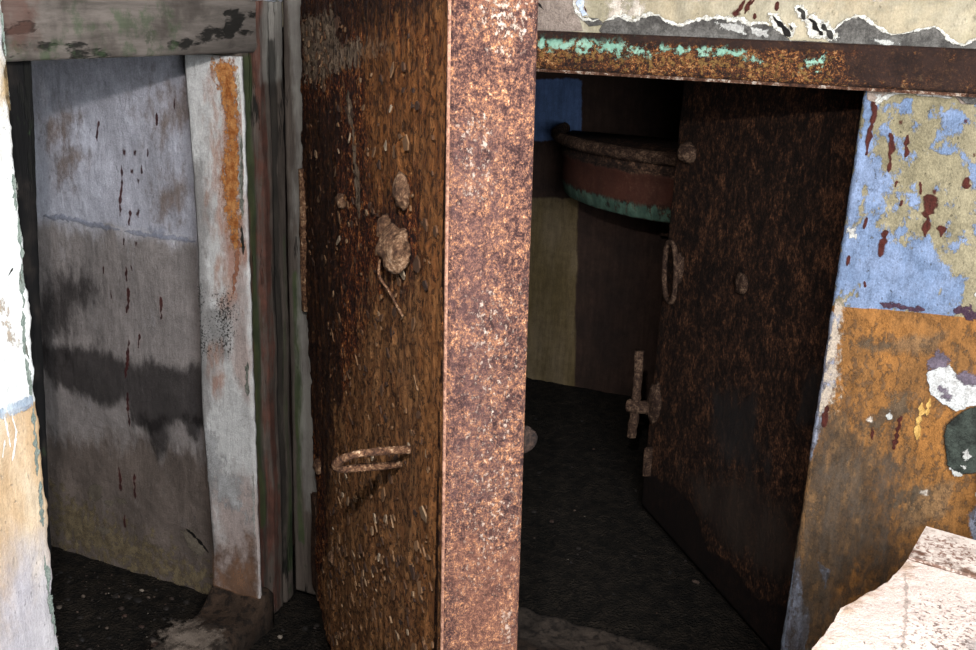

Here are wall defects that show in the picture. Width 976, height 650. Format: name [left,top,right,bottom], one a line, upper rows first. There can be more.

flaking render [537,0,976,49]
damp [119,148,149,225]
corrosion [210,57,242,294]
corrosion [330,101,409,178]
flaking render [867,91,976,105]
corrosion [306,197,380,282]
damp [40,277,239,455]
corrosion [327,255,431,430]
flaking render [914,349,976,440]
corrosion [322,440,434,650]